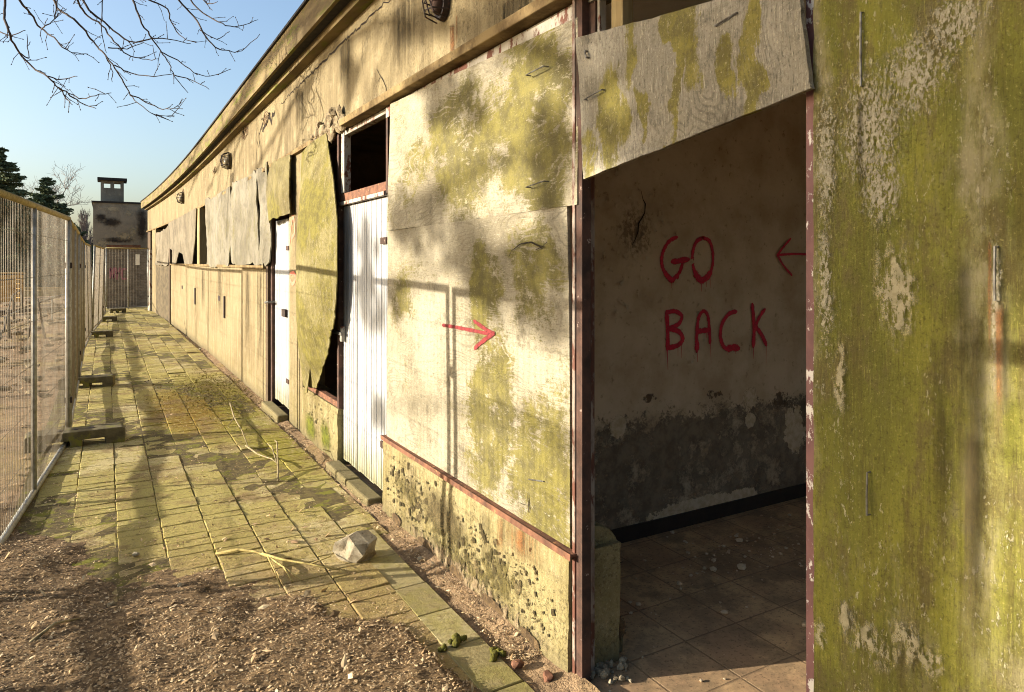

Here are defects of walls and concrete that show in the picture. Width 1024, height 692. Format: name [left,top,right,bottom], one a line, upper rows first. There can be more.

peeling [816,0,992,222]
crack [632,192,646,245]
peeling [818,236,844,404]
peeling [876,250,914,331]
leakage [959,270,979,595]
spalling [385,456,554,650]
peeling [839,602,941,676]